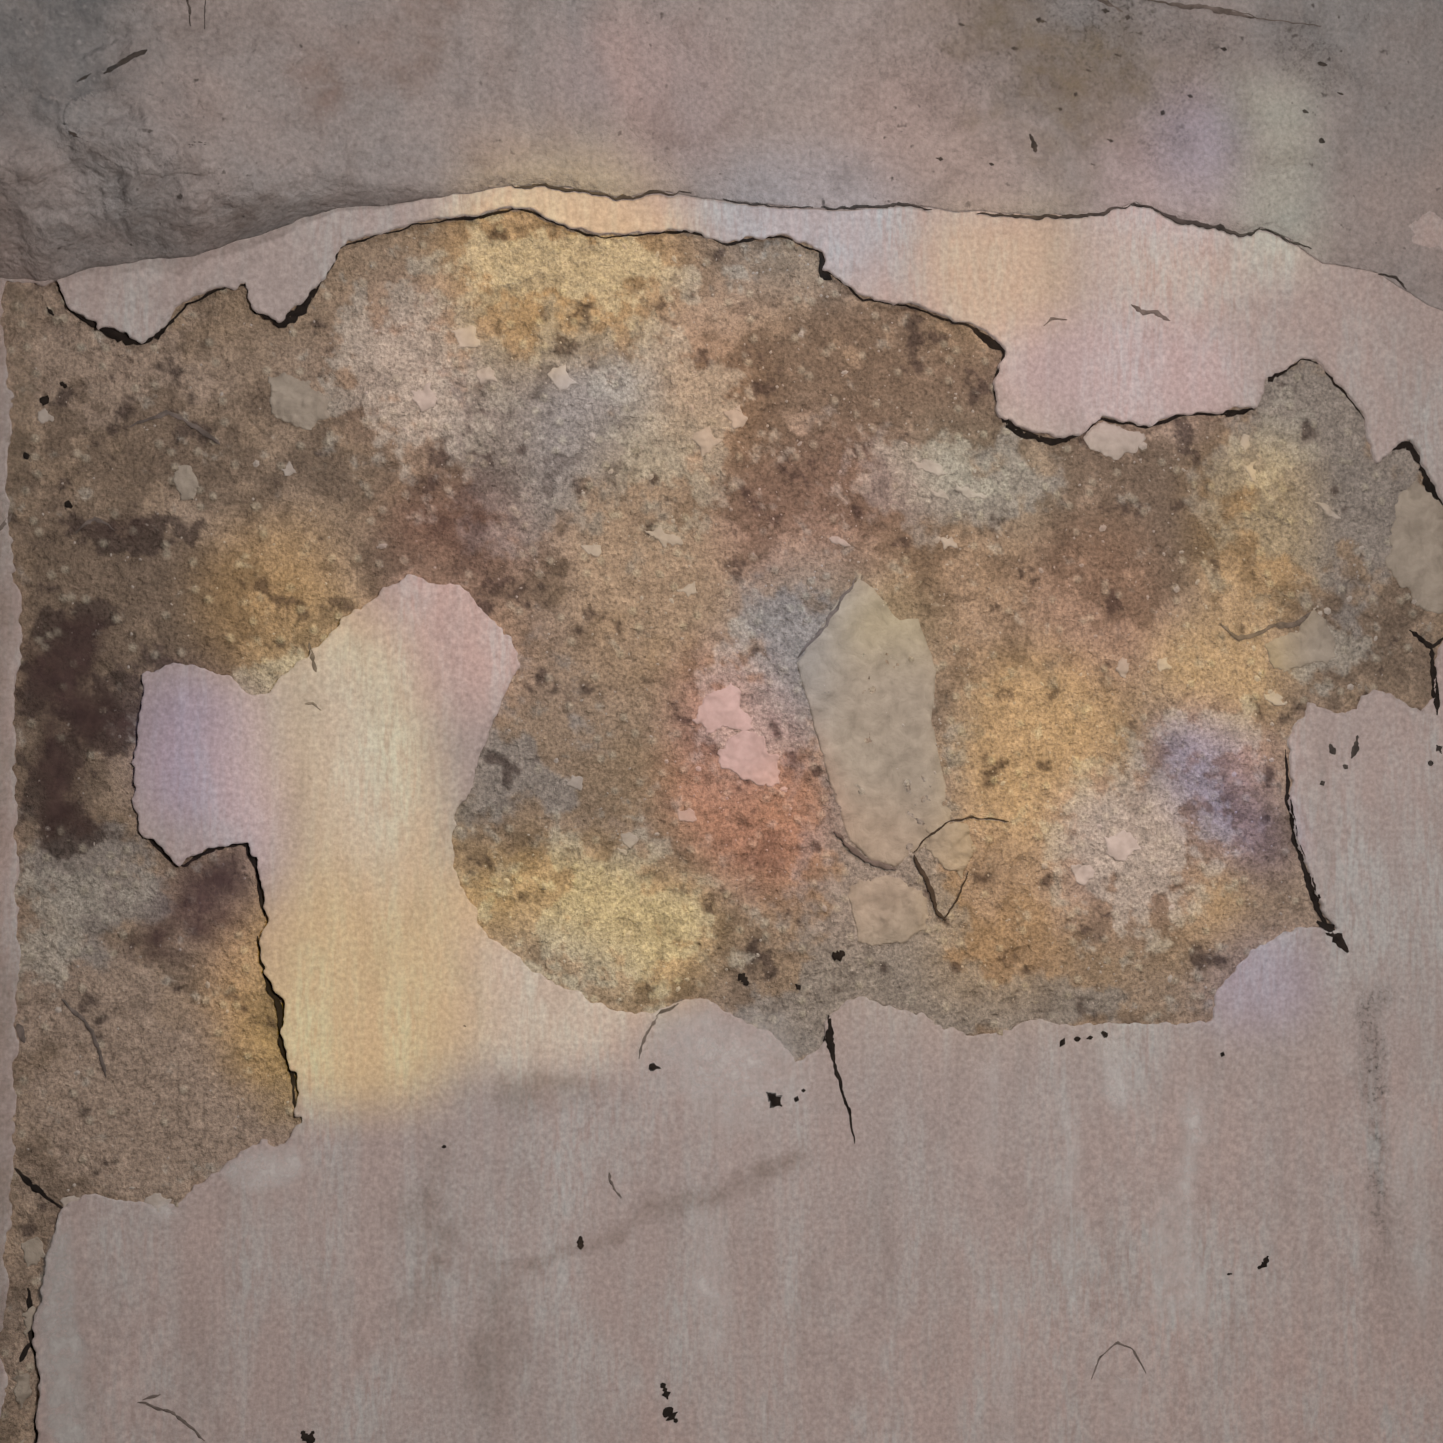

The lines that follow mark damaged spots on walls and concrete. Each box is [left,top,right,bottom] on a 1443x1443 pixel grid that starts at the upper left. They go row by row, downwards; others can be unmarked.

crack [1098,0,1321,27]
crack [1378,273,1407,290]
crack [57,183,1365,446]
spalling [1329,735,1359,769]
crack [834,815,1009,921]
crack [1285,749,1349,953]
spalling [832,950,845,962]
crack [823,1015,855,1144]
spalling [766,1088,806,1108]
spalling [22,1306,37,1337]
spalling [660,1383,678,1423]
spalling [300,1430,315,1443]